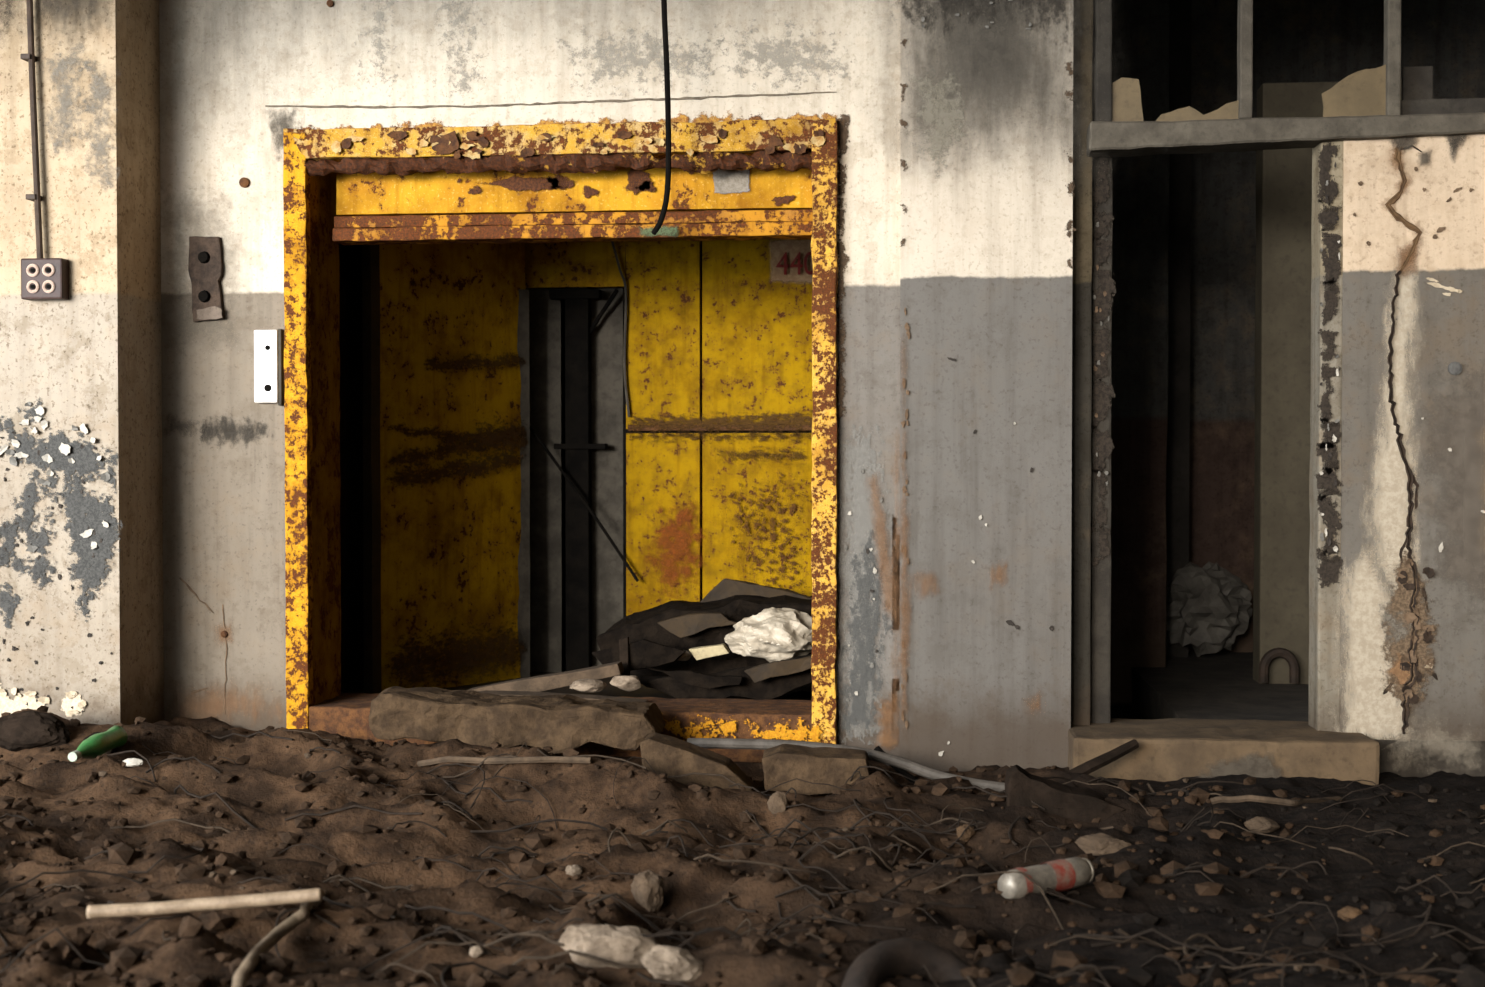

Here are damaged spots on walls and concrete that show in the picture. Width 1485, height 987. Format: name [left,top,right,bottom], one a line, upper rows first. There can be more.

rust [457,174,599,198]
rust [535,117,638,125]
rust [626,168,657,195]
rust [658,111,850,421]
water stain [913,74,965,166]
peeling [0,398,123,661]
rust [386,422,524,488]
rust [628,410,813,602]
peeling [1314,143,1356,588]
crack [1383,145,1438,734]
peeling [0,652,112,717]
spalling [1381,551,1439,713]